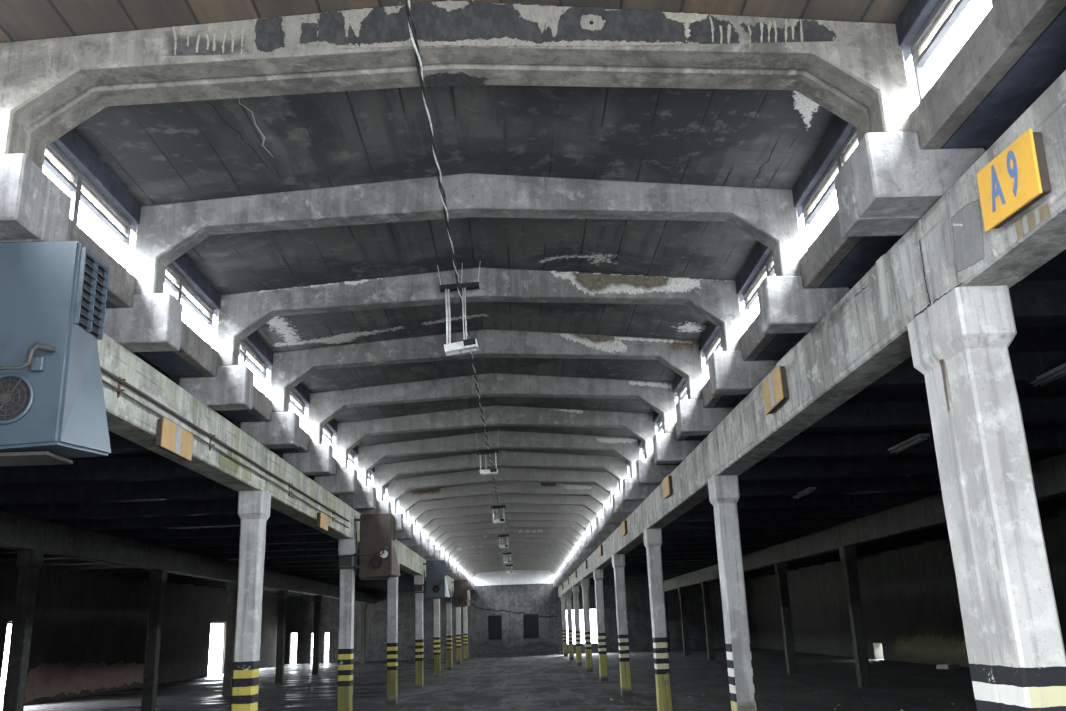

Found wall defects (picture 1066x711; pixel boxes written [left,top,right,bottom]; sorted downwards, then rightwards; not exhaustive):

peeling [431,0,474,12]
peeling [335,3,708,50]
spalling [792,91,820,131]
peeling [551,271,733,296]
spalling [266,316,303,342]